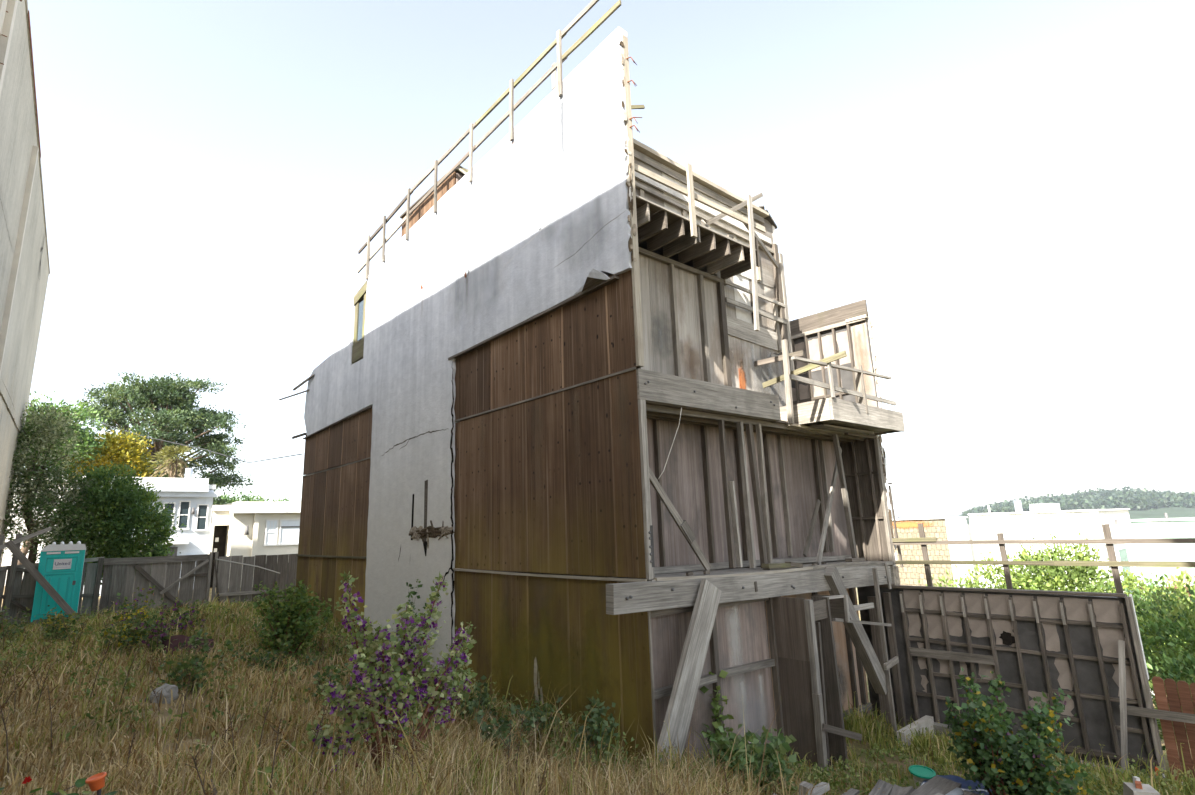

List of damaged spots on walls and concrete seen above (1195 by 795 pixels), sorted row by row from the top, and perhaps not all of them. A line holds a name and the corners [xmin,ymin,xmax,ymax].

peeling [619,41,645,262]
corrosion [738,368,746,389]
crack [381,361,454,646]